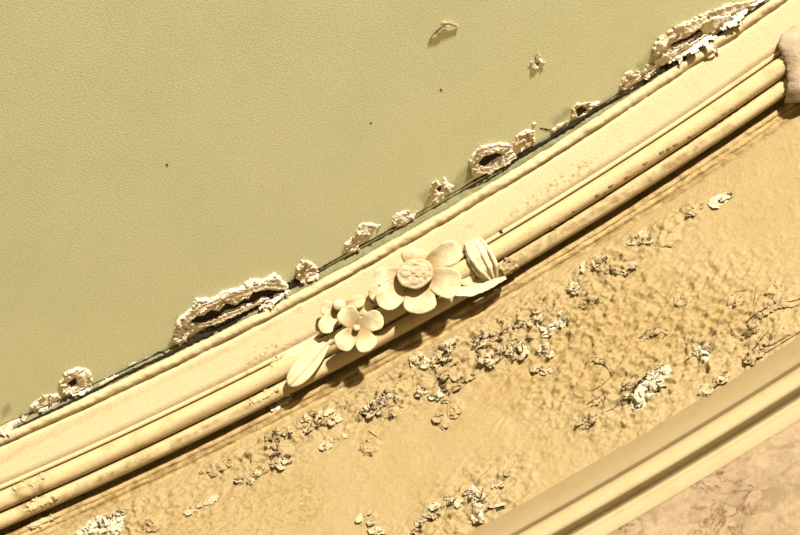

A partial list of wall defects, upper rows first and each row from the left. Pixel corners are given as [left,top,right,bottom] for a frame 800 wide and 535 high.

peeling [619,0,767,93]
peeling [468,122,537,177]
peeling [551,101,601,134]
peeling [171,272,290,346]
peeling [566,255,638,311]
peeling [0,367,119,437]
peeling [408,335,476,401]
peeling [471,310,570,375]
flaking render [618,364,672,411]
peeling [234,408,348,486]
peeling [76,509,126,535]
peeling [411,481,505,534]